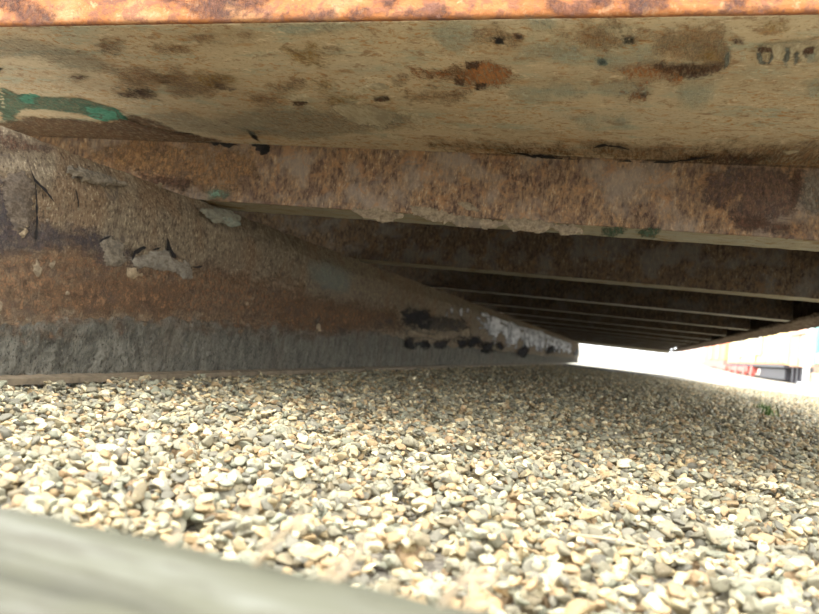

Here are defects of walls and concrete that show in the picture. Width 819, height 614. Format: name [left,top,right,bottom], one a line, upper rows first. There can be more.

rust [0,0,55,24]
rust [183,0,267,20]
rust [394,60,518,102]
rust [430,139,819,234]
peeling [200,190,241,227]
peeling [31,258,56,277]
peeling [98,235,203,280]
leakage [446,308,572,354]